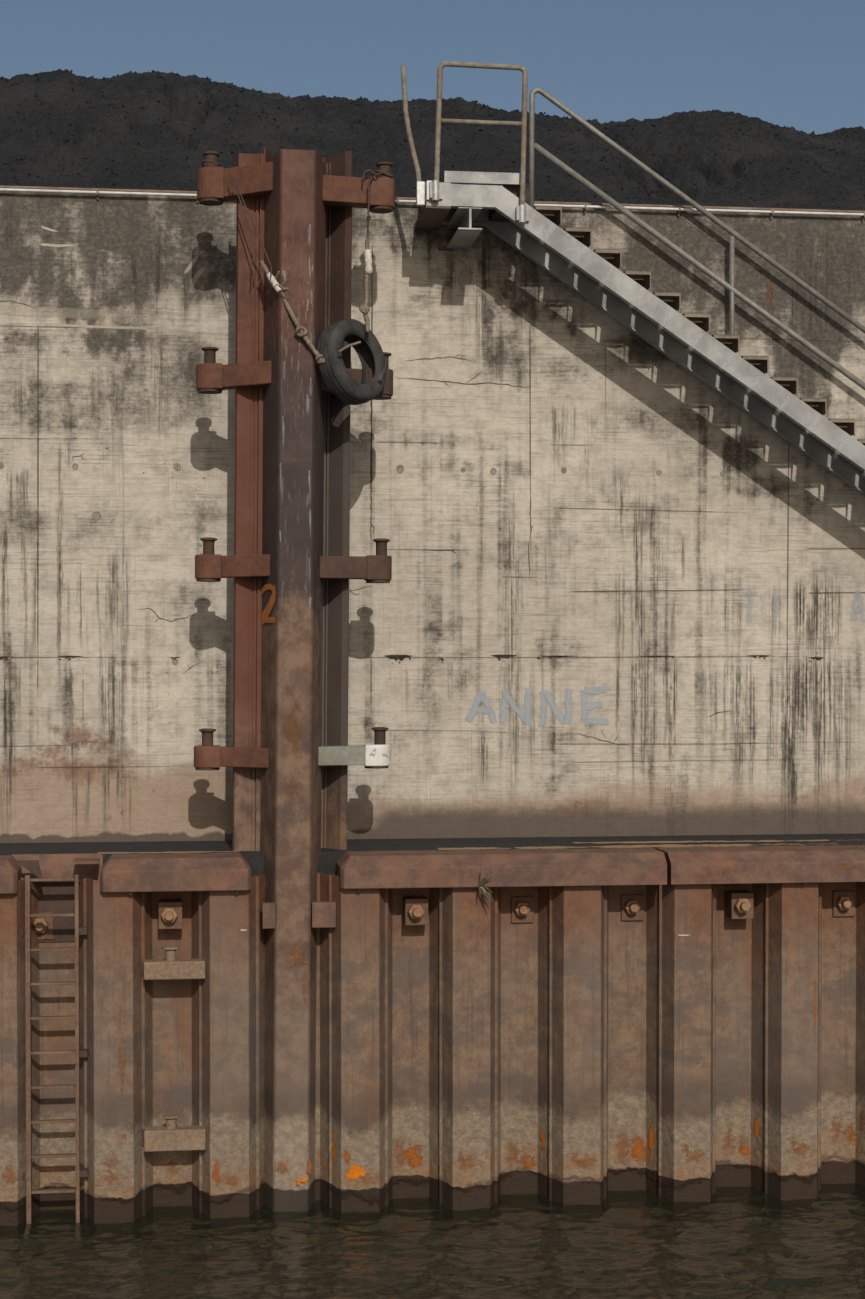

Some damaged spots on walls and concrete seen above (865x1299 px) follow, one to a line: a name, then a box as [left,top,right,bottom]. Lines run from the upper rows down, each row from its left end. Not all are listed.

water stain [796,585,840,641]
water stain [3,684,13,763]
water stain [782,671,807,789]
water stain [816,672,840,777]
rust [277,1161,312,1185]
rust [332,1132,372,1183]
rust [396,1143,423,1167]
rust [617,1122,654,1165]
rust [726,1116,759,1155]